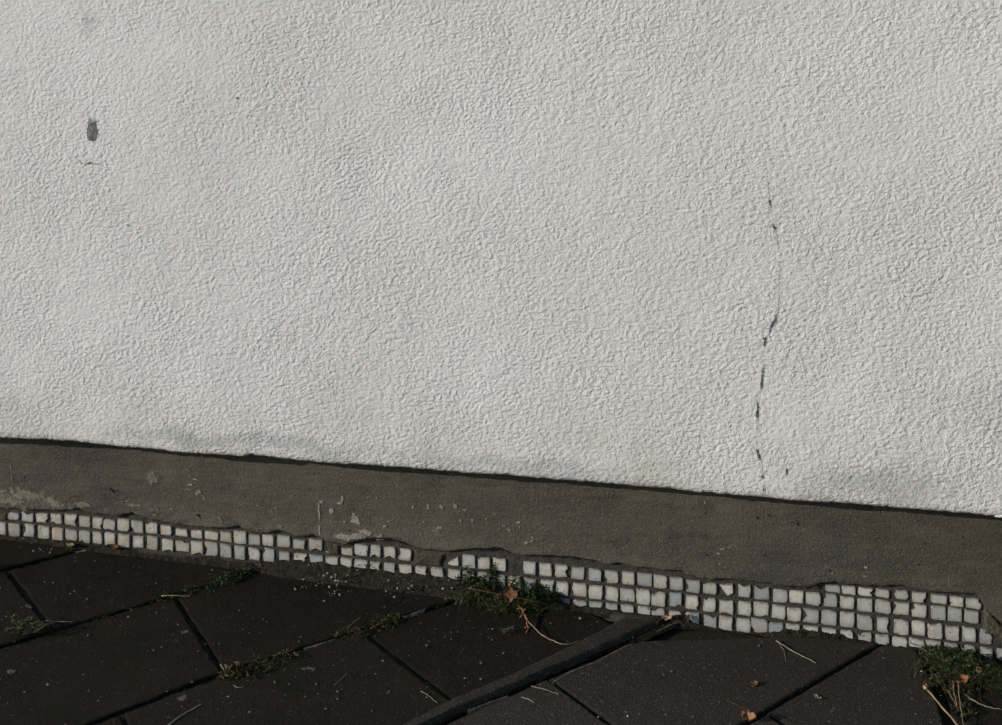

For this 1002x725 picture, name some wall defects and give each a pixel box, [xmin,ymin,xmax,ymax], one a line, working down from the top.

crack [753,179,787,497]
peeling [0,486,90,521]
spalling [414,549,446,567]